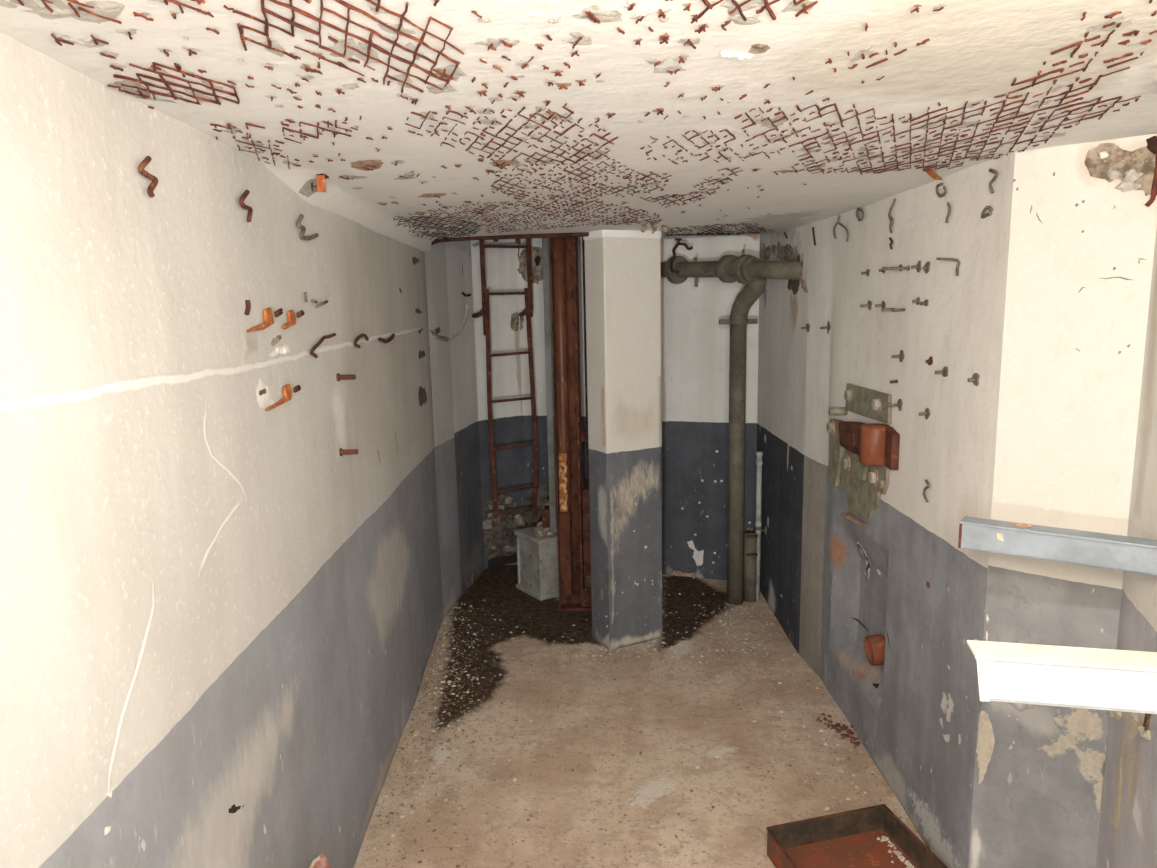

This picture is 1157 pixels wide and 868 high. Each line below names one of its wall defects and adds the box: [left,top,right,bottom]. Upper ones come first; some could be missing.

spalling [0,0,223,103]
spalling [296,64,322,96]
peeling [328,33,380,63]
peeling [394,65,467,120]
spalling [544,0,709,75]
flaking render [698,0,1157,224]
peeling [338,143,691,238]
crack [198,399,249,579]
peeling [669,534,716,578]
crack [108,582,155,795]
peeling [135,629,309,868]
peeling [976,699,1153,815]